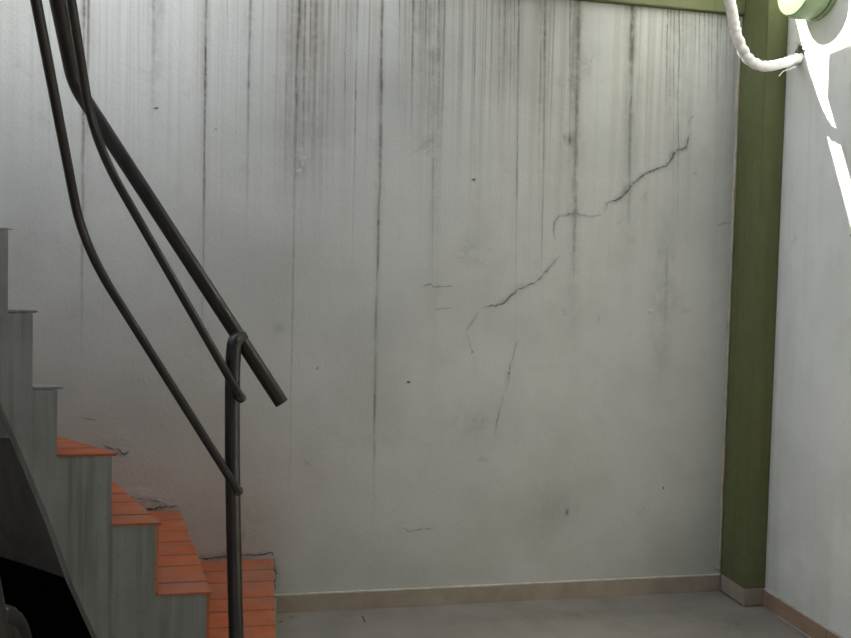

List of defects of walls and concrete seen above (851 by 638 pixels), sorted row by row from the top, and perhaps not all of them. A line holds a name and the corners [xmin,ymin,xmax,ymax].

crack [471,132,690,324]